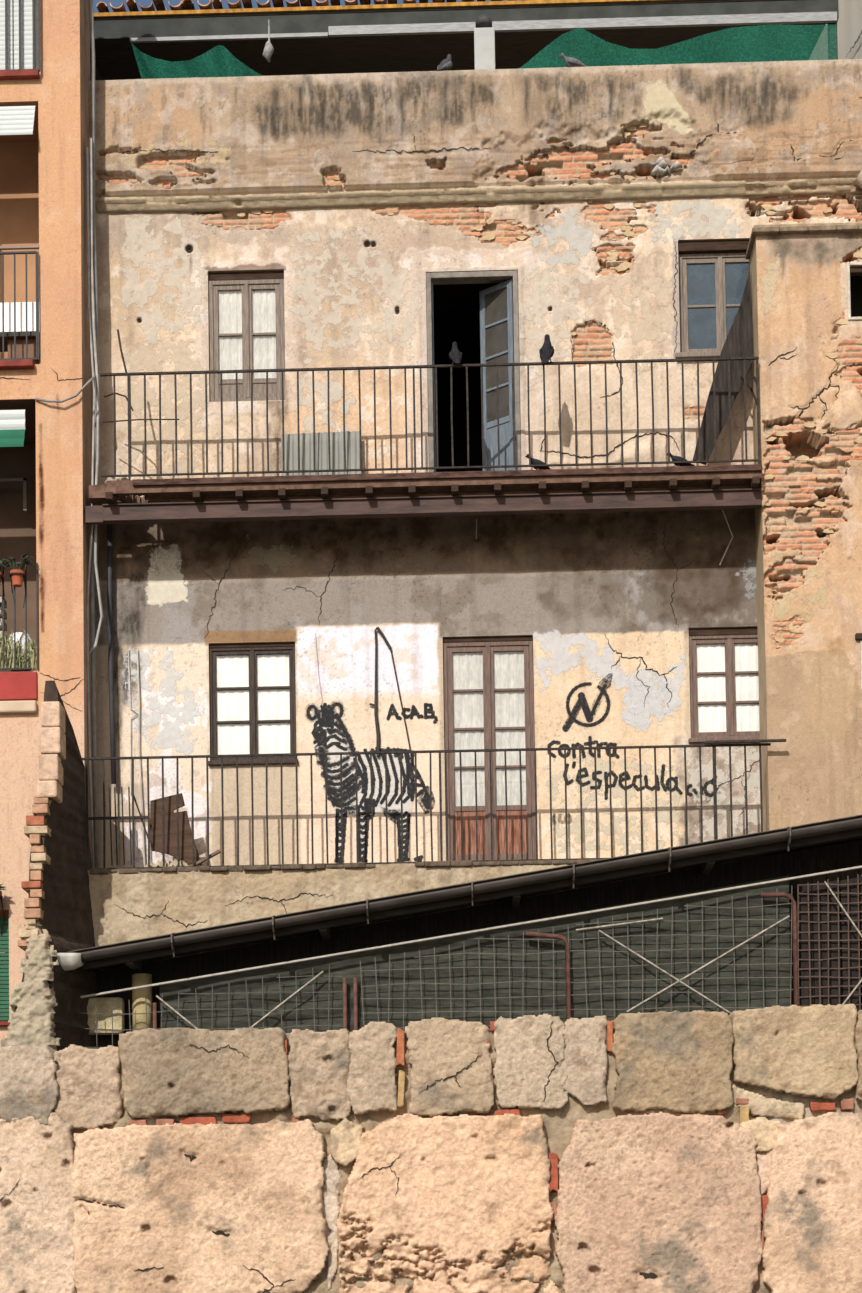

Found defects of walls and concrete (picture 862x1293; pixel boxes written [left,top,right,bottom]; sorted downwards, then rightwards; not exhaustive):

water stain [258,80,431,134]
water stain [446,85,492,122]
water stain [540,80,585,117]
flaking render [494,79,694,187]
water stain [681,79,796,122]
peeling [371,194,862,397]
peeling [120,209,292,478]
flaking render [735,418,862,648]
peeling [145,544,189,607]
crack [204,544,241,638]
crack [603,633,677,707]
crack [543,1020,559,1102]